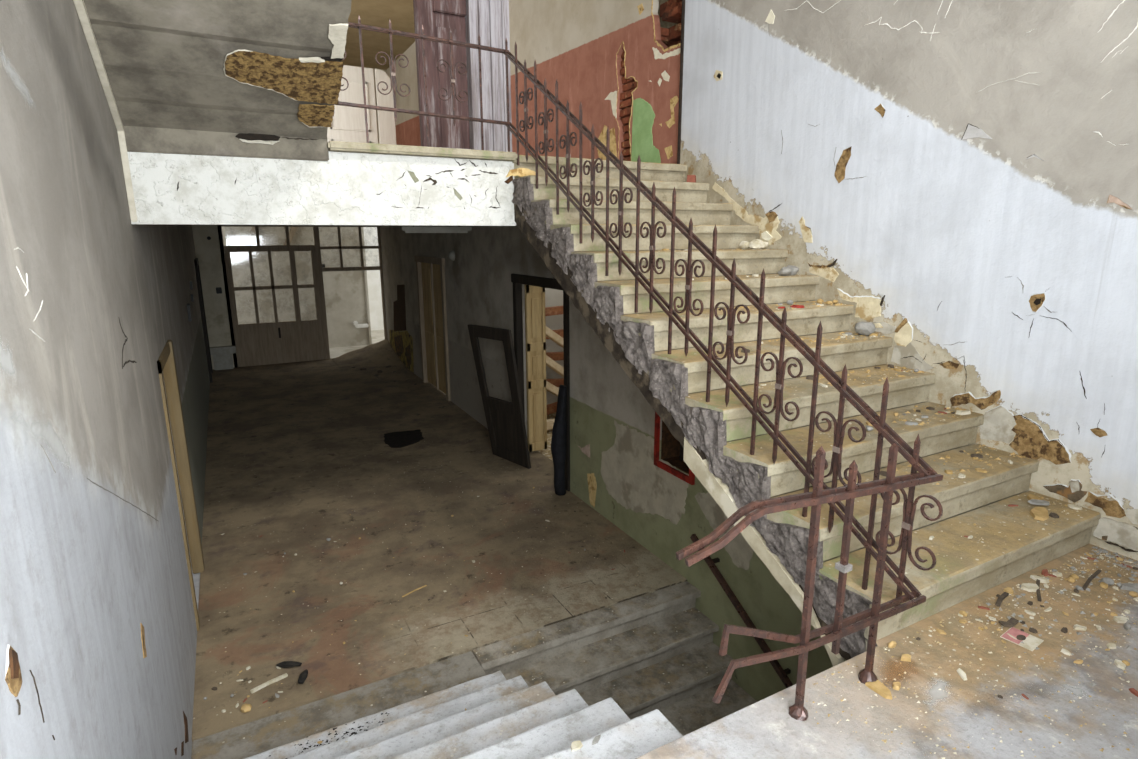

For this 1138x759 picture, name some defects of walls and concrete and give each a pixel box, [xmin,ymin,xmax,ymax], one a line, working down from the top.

spalling [223,23,348,127]
peeling [597,0,682,163]
spalling [834,146,866,183]
spalling [1013,290,1072,335]
spalling [878,390,1071,485]
spalling [1090,404,1108,437]
spalling [5,645,22,715]